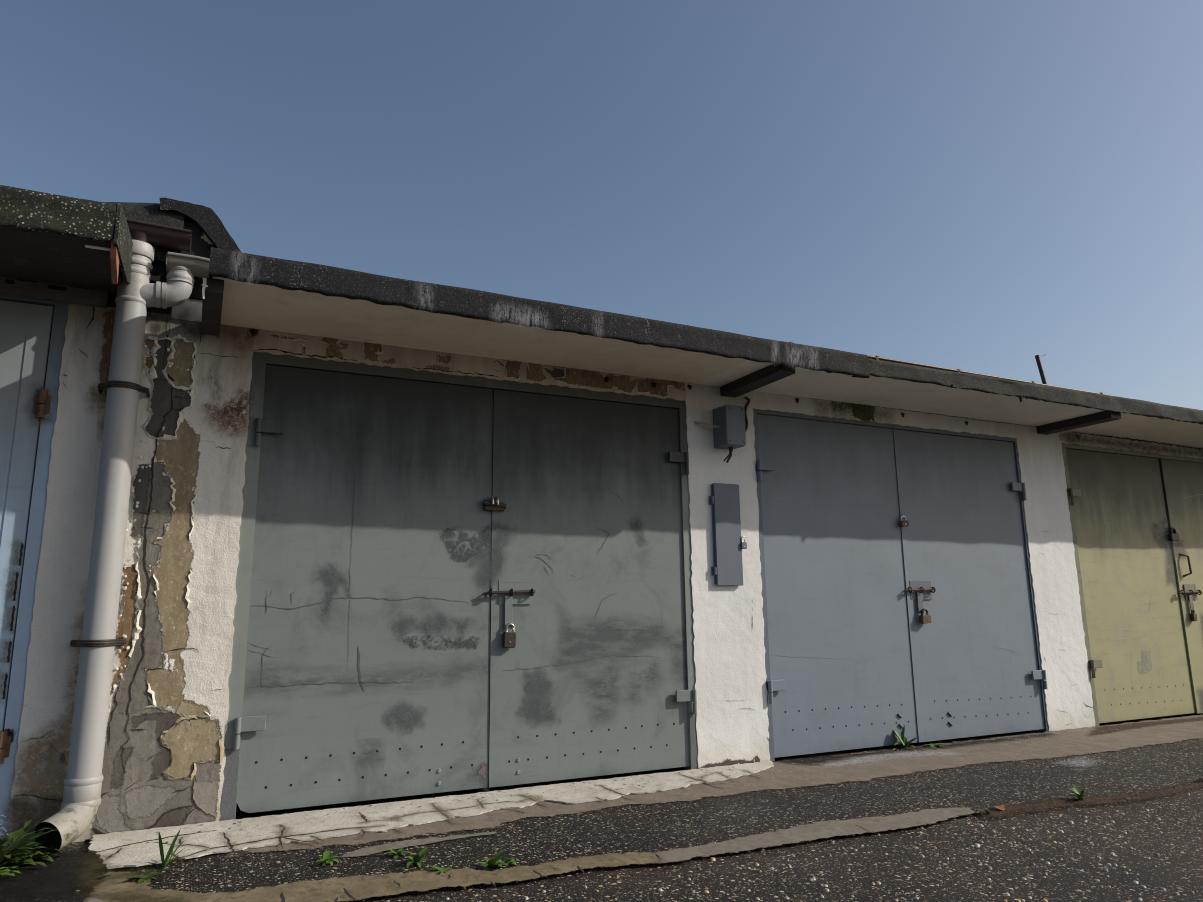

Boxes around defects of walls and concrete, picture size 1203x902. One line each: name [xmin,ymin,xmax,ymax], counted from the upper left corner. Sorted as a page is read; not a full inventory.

peeling [253,333,396,366]
peeling [413,354,685,397]
water stain [210,398,247,429]
peeling [90,334,225,839]
crack [88,313,548,864]